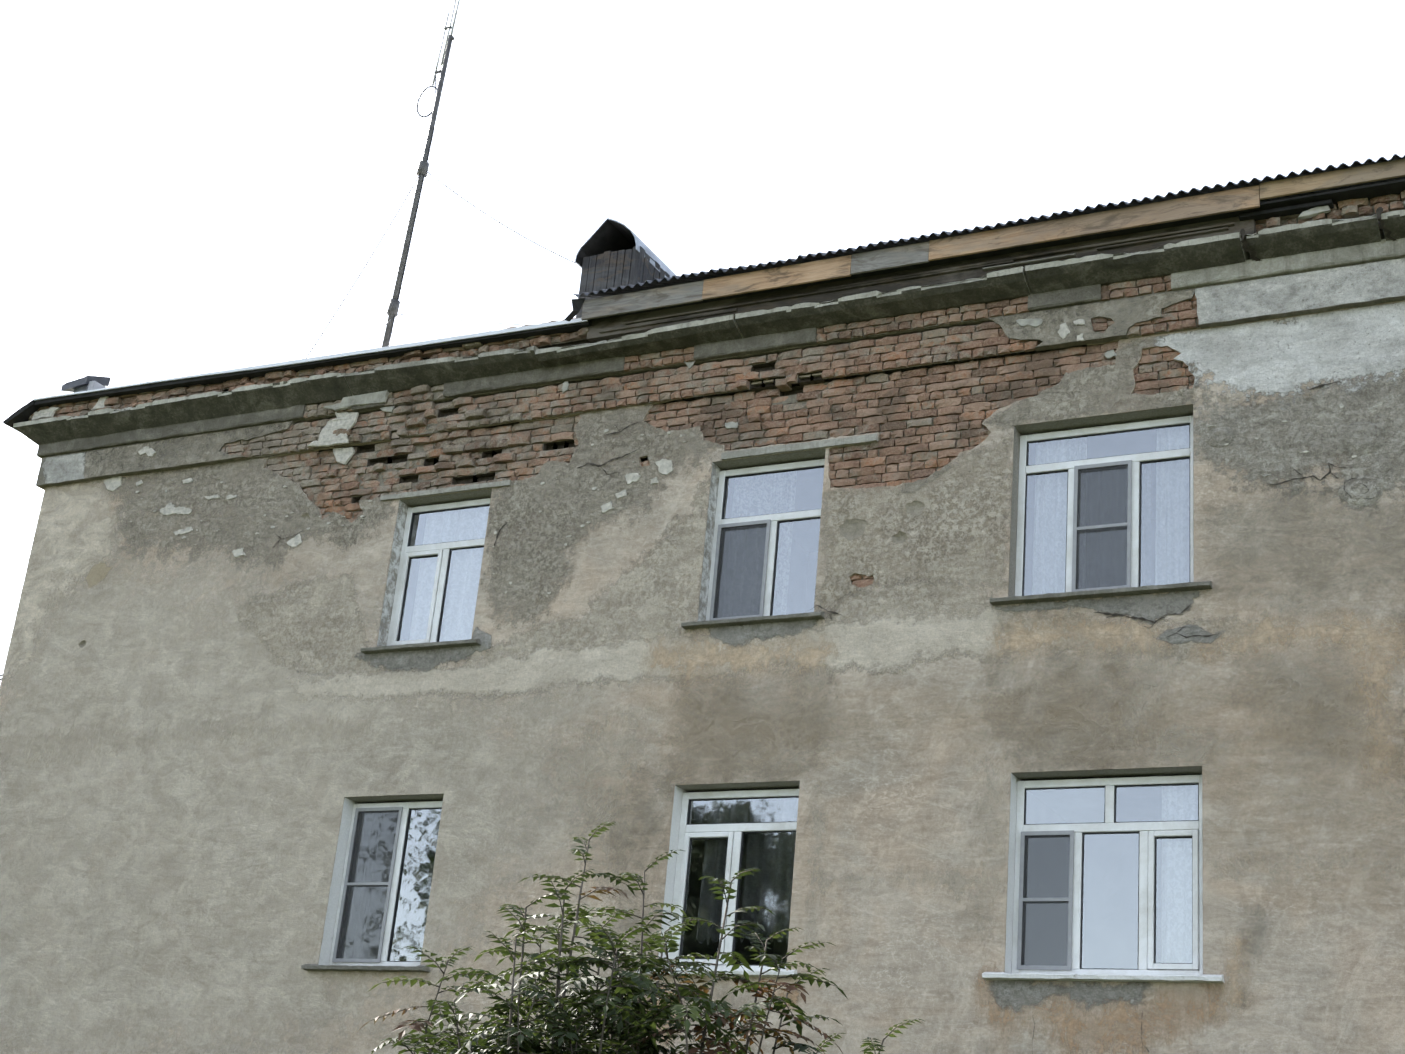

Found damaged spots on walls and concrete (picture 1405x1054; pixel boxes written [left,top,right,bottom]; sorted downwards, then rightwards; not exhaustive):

flaking render [2,258,1405,686]